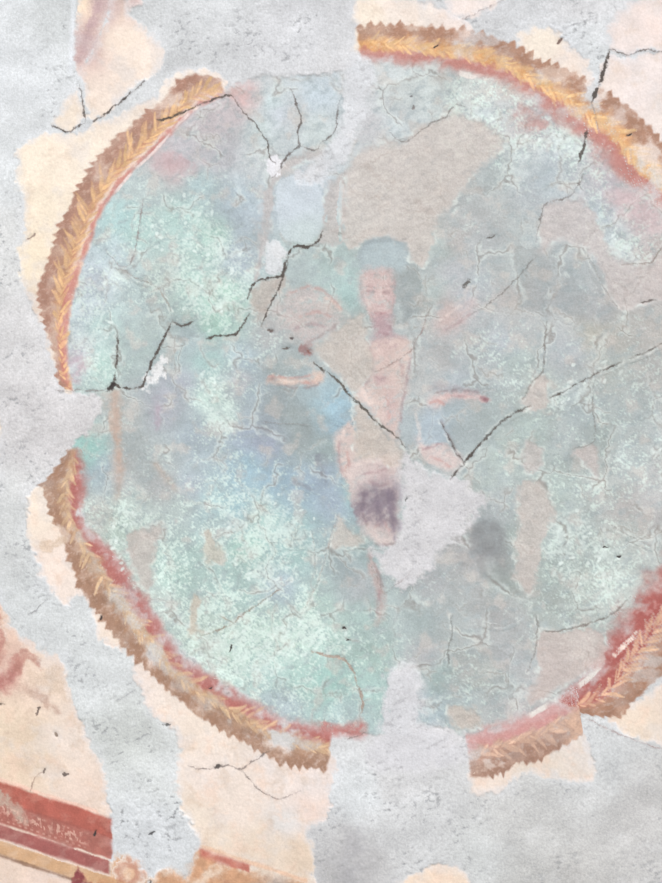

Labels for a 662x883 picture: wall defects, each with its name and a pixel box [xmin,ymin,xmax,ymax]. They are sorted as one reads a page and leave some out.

crack [51,80,146,134]
crack [155,87,340,179]
crack [388,103,465,143]
crack [471,48,662,315]
peeling [65,253,124,393]
crack [54,198,325,393]
crack [374,304,428,373]
crack [312,361,406,448]
crack [435,317,662,484]
crack [187,747,302,800]